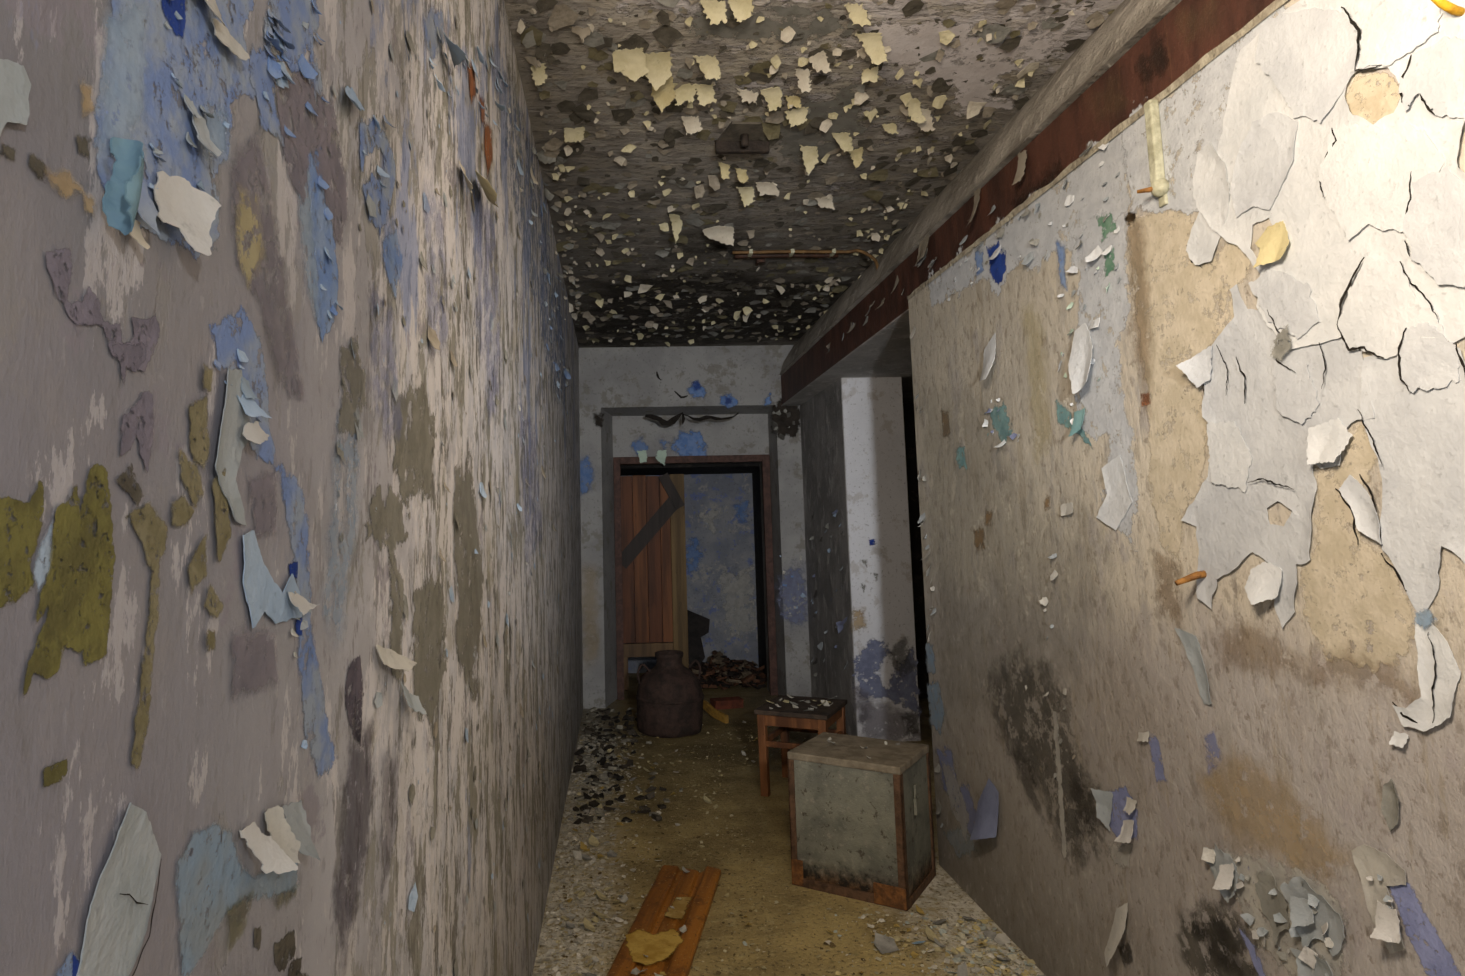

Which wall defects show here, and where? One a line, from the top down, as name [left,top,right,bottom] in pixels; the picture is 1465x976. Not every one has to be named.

peeling [0,391,154,695]
flaking render [43,0,1115,976]
leakage [994,664,1100,862]
peeling [1091,786,1138,868]
peeling [1137,731,1166,782]
peeling [1381,778,1399,831]
peeling [1104,903,1133,967]
leakage [1177,901,1258,976]
peeling [1201,844,1347,976]
peeling [1351,844,1461,976]